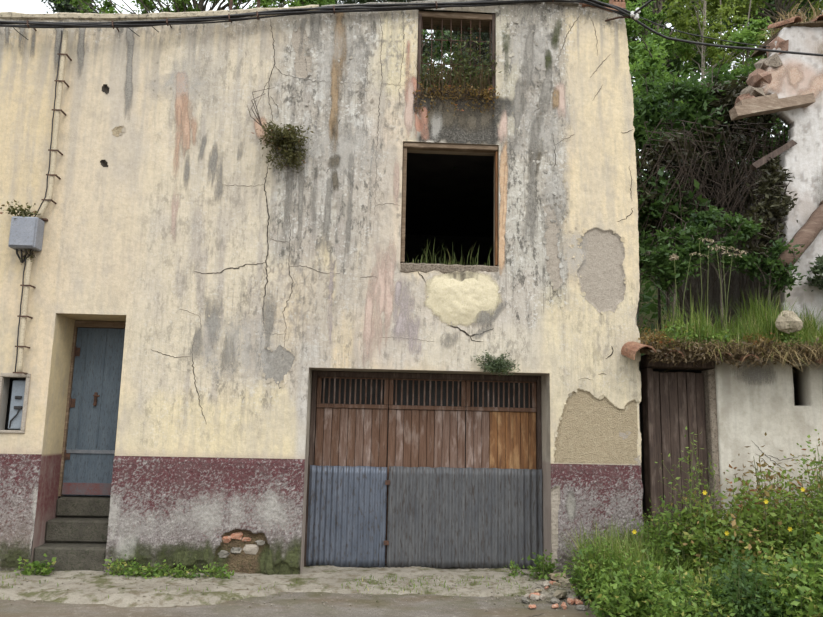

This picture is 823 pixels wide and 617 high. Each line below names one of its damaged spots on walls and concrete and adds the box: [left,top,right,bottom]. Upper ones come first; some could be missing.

corrosion [175,72,196,166]
flaking render [763,65,823,98]
flaking render [512,81,570,291]
crack [194,158,340,370]
flaking render [577,228,626,314]
crack [151,309,207,424]
flaking render [258,345,295,389]
flaking render [554,388,639,464]
spalling [215,529,270,574]